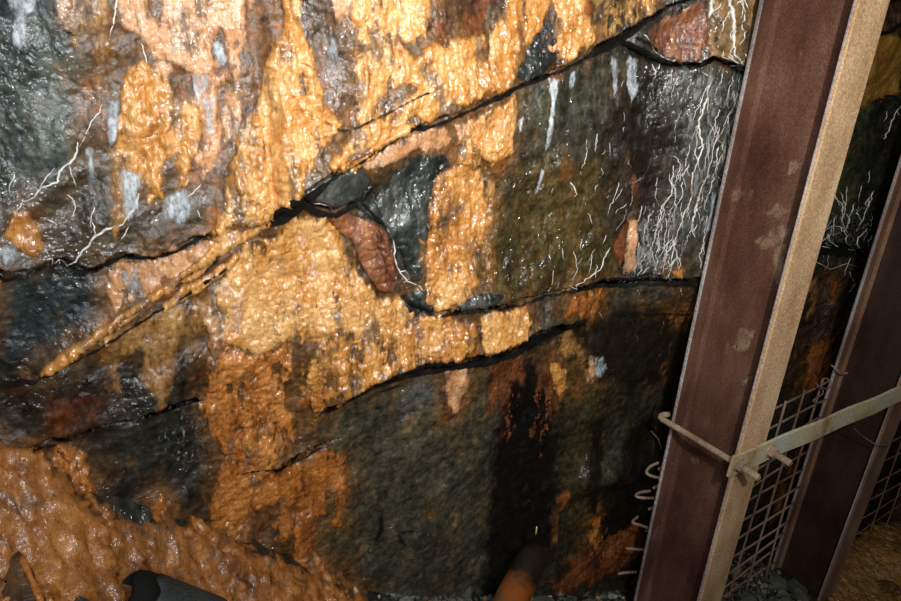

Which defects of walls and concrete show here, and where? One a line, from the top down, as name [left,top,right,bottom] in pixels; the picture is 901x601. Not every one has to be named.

crack [266,0,745,227]
water stain [547,78,557,143]
water stain [611,57,668,190]
crack [0,233,239,388]
crack [408,272,701,318]
crack [33,399,204,452]
crack [315,319,588,419]
corrosion [487,350,526,442]
corrosion [529,357,558,457]
corrosion [271,442,349,557]
water stain [482,357,570,595]